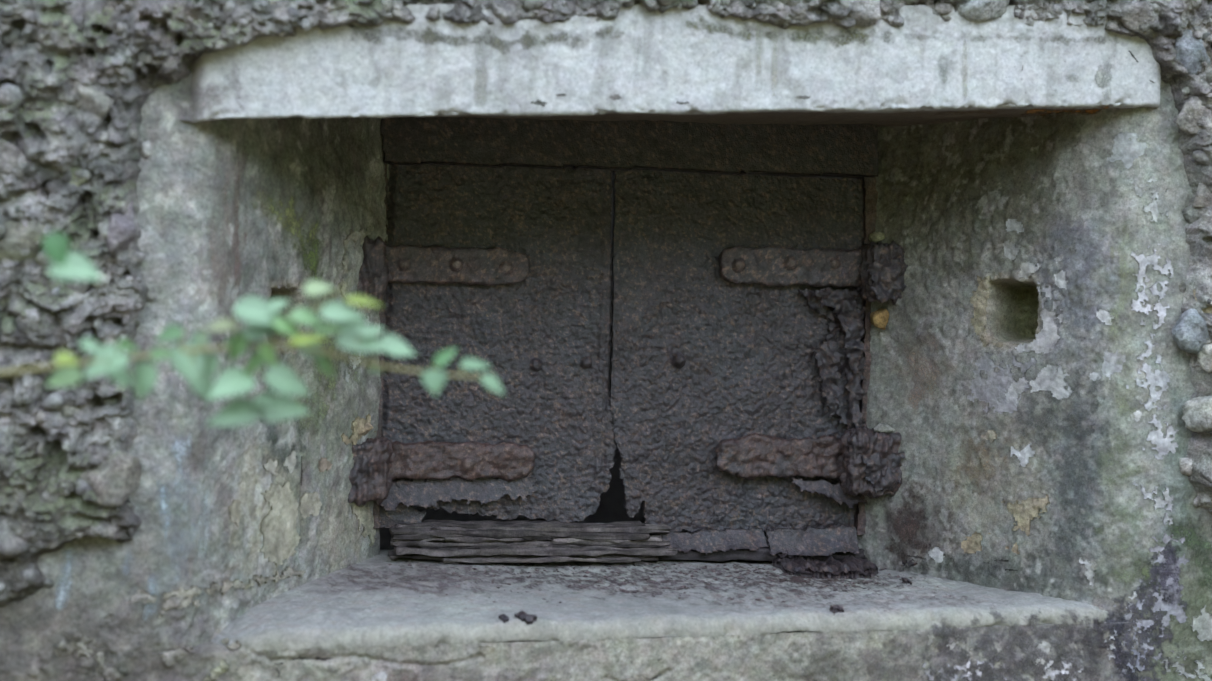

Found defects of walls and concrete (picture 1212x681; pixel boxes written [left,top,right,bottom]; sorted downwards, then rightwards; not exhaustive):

spalling [967,219,1074,414]
peeling [1088,131,1179,459]
peeling [1011,443,1035,467]
peeling [259,451,322,567]
spalling [349,502,377,546]
spalling [1001,494,1050,554]
spalling [902,547,945,568]